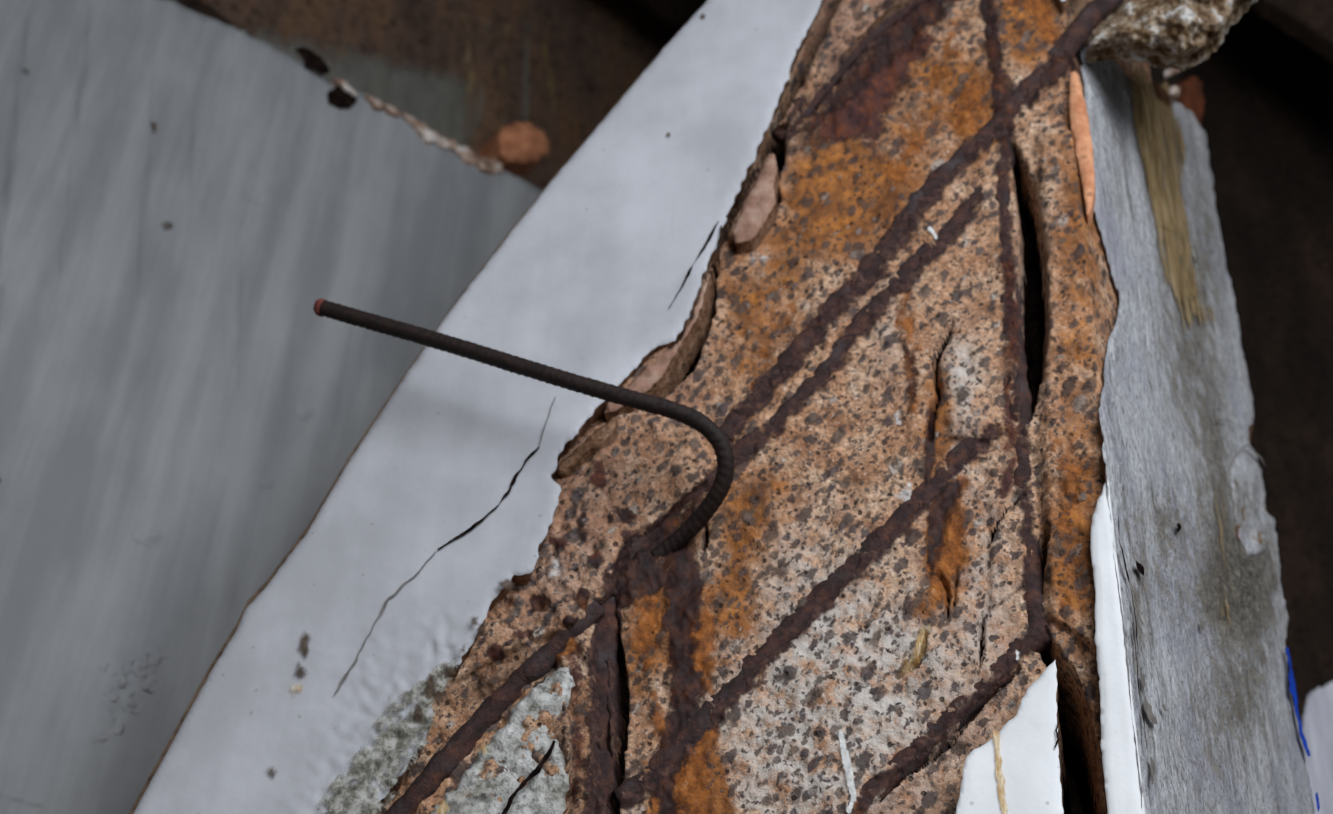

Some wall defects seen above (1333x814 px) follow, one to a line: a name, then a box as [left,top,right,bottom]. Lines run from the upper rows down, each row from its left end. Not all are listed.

peeling [255,32,503,175]
crack [668,9,835,309]
corrosion [798,0,1078,200]
corrosion [292,634,309,690]
crack [334,397,556,696]
crack [502,740,555,814]
corrosion [556,587,591,798]
corrosion [613,487,720,814]
spalling [313,0,1123,814]
corrosion [895,291,970,607]
corrosion [993,731,1008,814]
crack [1016,179,1045,418]